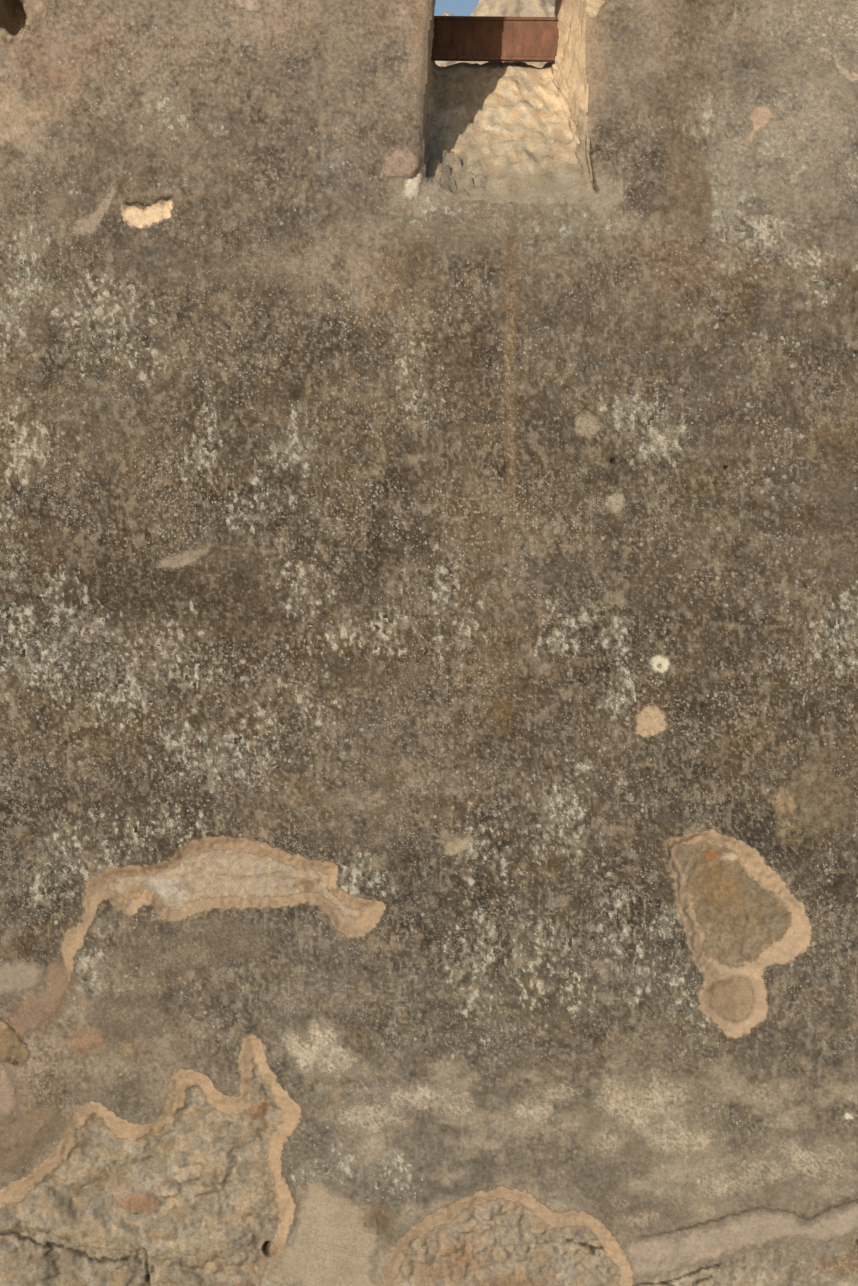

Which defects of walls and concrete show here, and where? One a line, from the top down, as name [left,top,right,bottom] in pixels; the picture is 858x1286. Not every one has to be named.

spalling [0,0,53,44]
peeling [73,180,172,235]
spalling [61,835,386,982]
spalling [665,829,812,1039]
spalling [0,1019,29,1067]
spalling [0,1034,303,1286]
spalling [381,1186,635,1286]
crack [567,1200,858,1254]
crack [632,1264,719,1286]